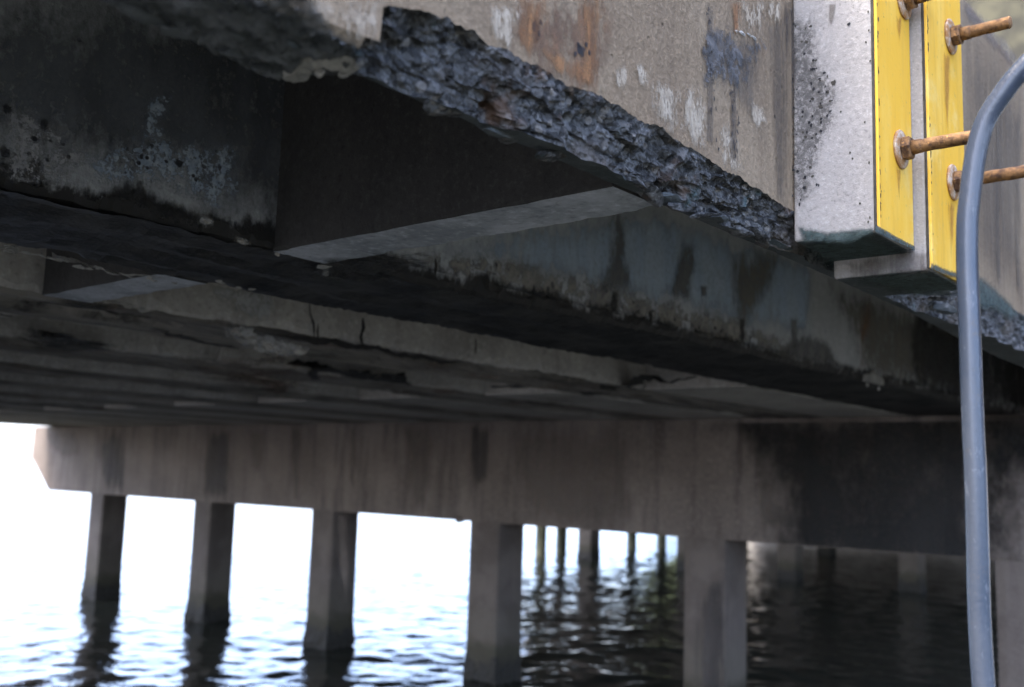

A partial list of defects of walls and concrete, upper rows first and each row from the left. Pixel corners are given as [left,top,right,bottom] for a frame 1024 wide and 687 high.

water stain [0,8,285,228]
spalling [117,0,842,272]
rust [518,1,607,84]
water stain [655,3,795,191]
crack [273,303,477,385]
crack [582,374,697,396]
water stain [495,215,960,397]
spalling [884,290,958,325]
spalling [980,304,1024,351]
water stain [982,350,1024,544]